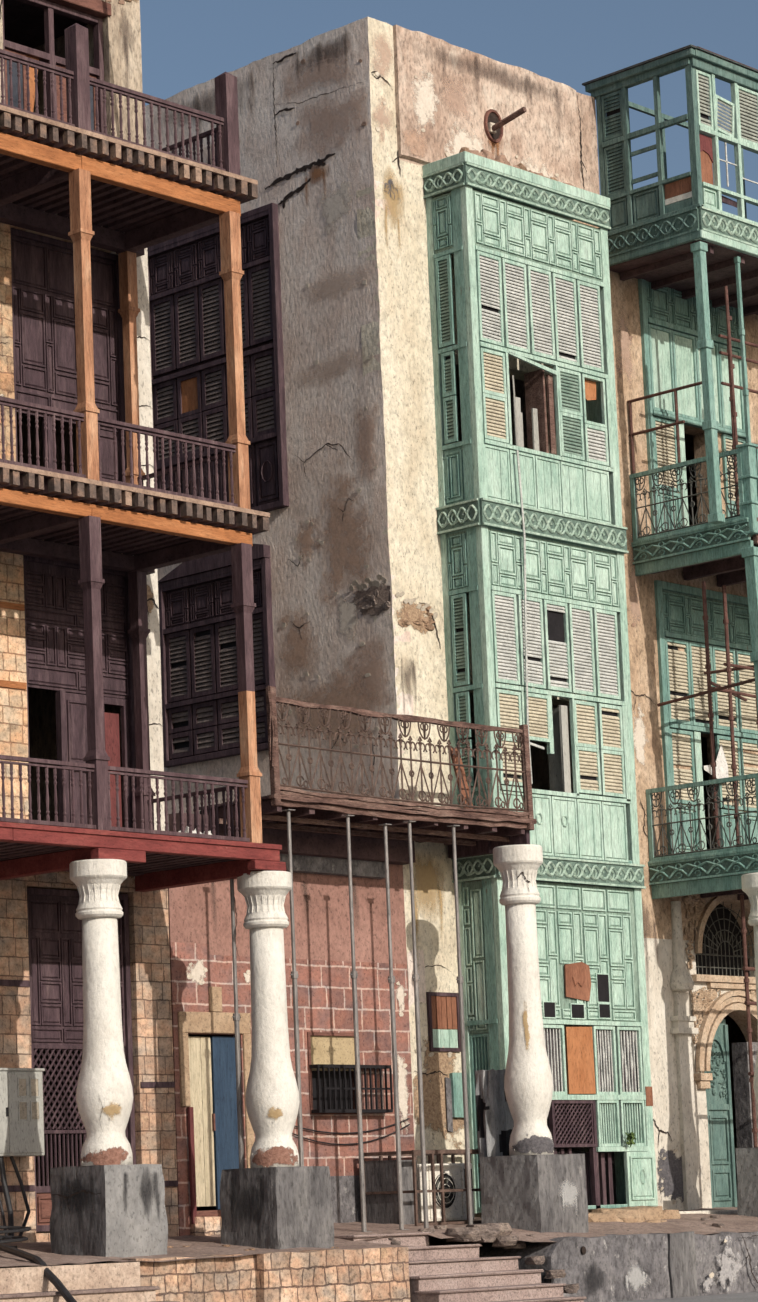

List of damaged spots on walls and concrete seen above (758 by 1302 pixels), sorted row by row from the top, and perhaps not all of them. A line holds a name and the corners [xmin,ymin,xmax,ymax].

crack [265,53,390,209]
crack [299,443,351,477]
flaking render [358,407,377,472]
flaking render [338,574,441,649]
flaking render [186,960,208,985]
peeling [80,1147,131,1165]
peeling [249,1146,298,1167]
peeling [703,1236,757,1292]